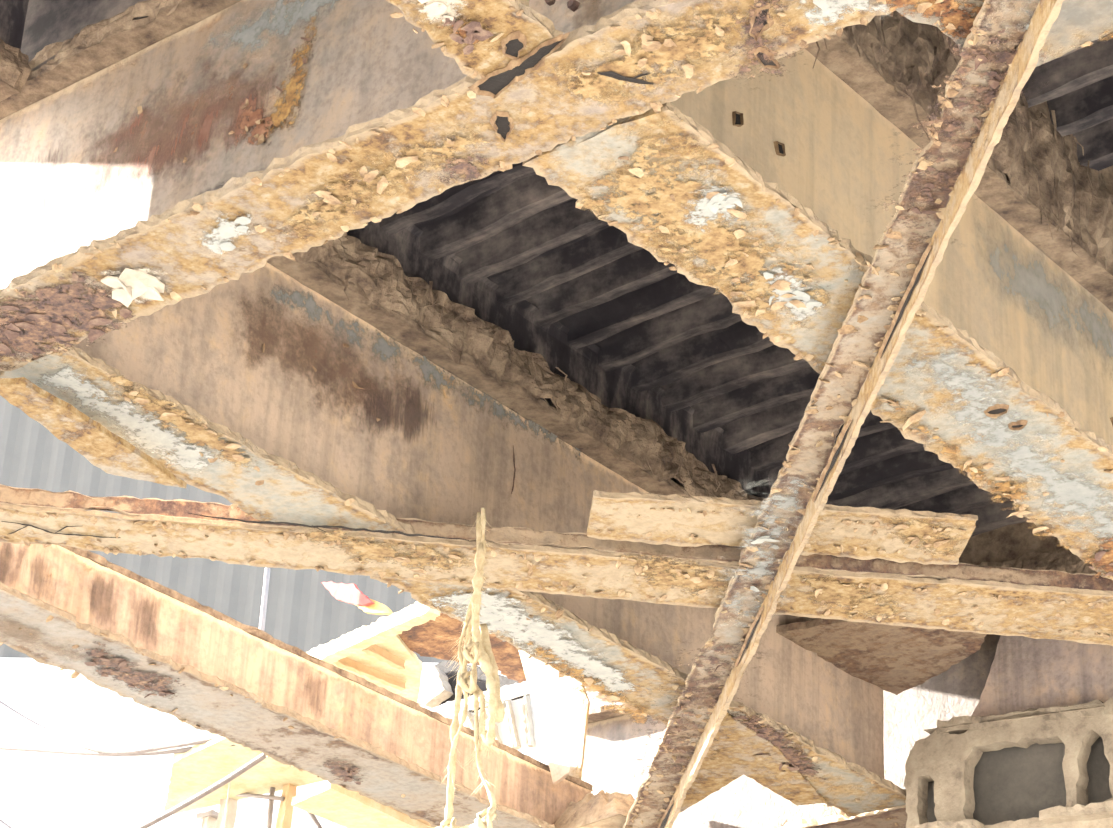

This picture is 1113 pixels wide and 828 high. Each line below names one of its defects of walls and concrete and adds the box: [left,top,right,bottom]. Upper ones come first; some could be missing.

corrosion [74,18,316,209]
corrosion [283,123,488,245]
corrosion [557,0,843,325]
corrosion [837,0,1026,334]
corrosion [243,301,428,438]
corrosion [231,504,476,594]
corrosion [740,445,811,548]
corrosion [788,576,906,622]
corrosion [831,518,967,558]
corrosion [0,615,200,728]
corrosion [527,543,832,828]
corrosion [317,757,363,788]